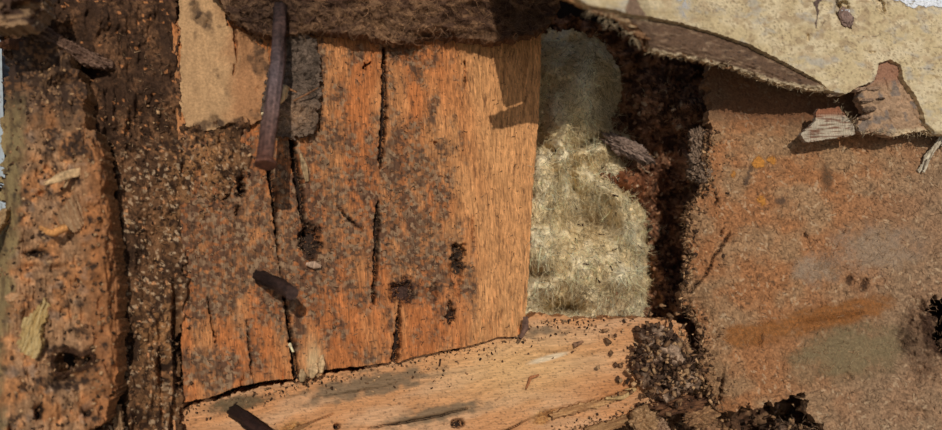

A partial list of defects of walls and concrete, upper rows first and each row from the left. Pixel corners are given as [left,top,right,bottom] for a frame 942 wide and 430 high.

crack [377,48,386,168]
peeling [826,60,927,139]
crack [338,205,380,302]
crack [282,297,299,383]
crack [390,312,400,362]